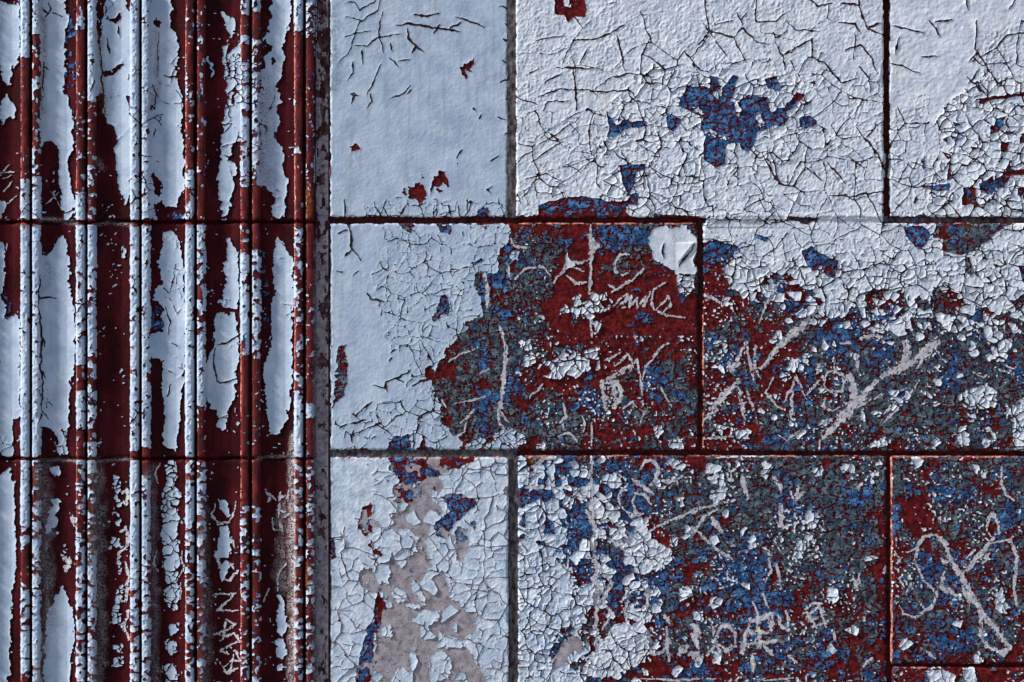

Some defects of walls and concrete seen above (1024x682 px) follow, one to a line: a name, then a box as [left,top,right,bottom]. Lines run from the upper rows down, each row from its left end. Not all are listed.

peeling [0,0,614,682]
crack [330,0,1024,682]
peeling [516,0,1024,682]